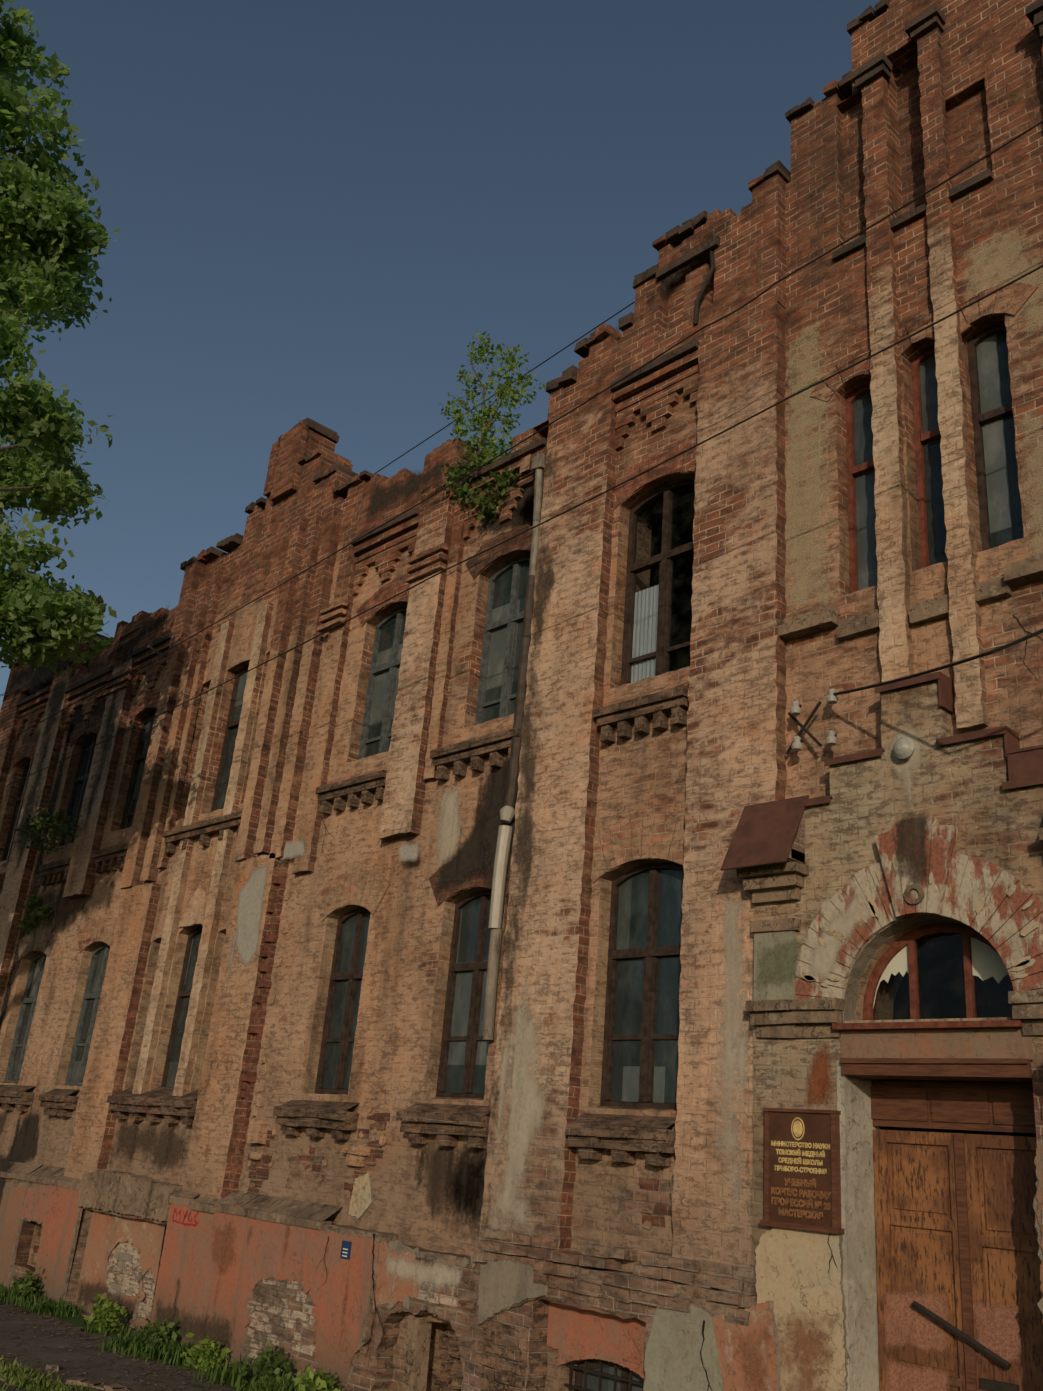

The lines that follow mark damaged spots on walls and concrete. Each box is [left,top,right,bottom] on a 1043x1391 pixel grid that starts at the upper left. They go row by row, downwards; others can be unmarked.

leakage [417,546,554,1231]
peeling [802,894,897,987]
peeling [1006,885,1038,936]
peeling [1011,956,1036,979]
spalling [102,1240,153,1321]
spalling [238,1277,320,1378]